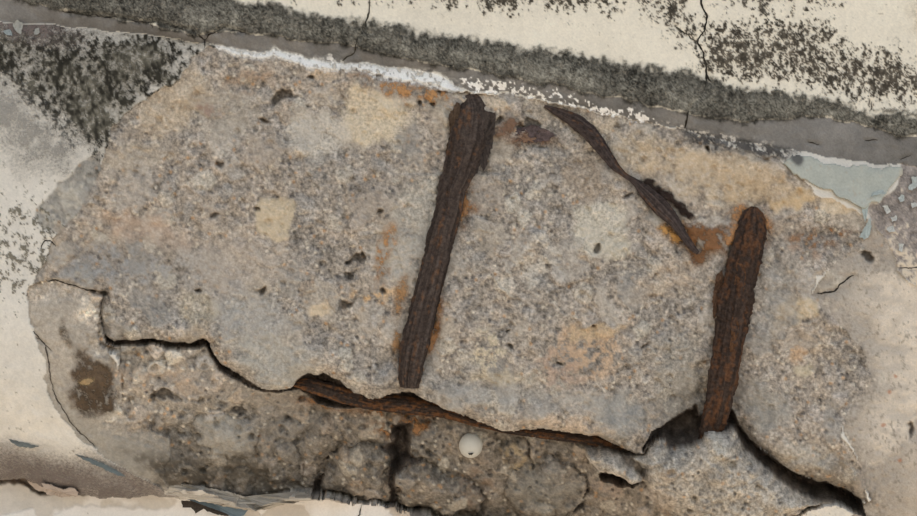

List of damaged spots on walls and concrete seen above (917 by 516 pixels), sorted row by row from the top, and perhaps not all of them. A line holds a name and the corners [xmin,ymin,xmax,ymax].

water stain [0,24,668,173]
water stain [431,0,533,18]
water stain [545,0,626,19]
water stain [638,0,917,108]
spalling [398,94,496,389]
spalling [544,105,708,255]
peeling [783,155,903,221]
spalling [28,281,171,492]
spalling [98,314,674,516]
spalling [698,206,767,439]
spalling [633,404,866,516]
peeling [813,219,917,516]